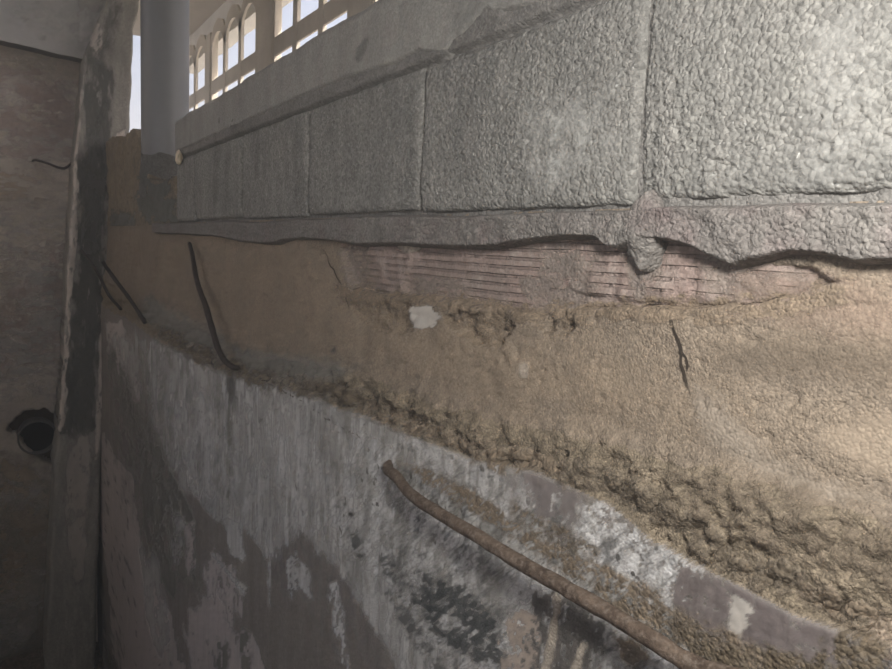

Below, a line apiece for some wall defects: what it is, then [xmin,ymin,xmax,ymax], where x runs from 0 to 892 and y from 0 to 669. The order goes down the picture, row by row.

spalling [339,239,837,348]
crack [667,308,691,395]
damp [111,351,196,598]
damp [142,297,892,669]
corrosion [412,466,892,669]